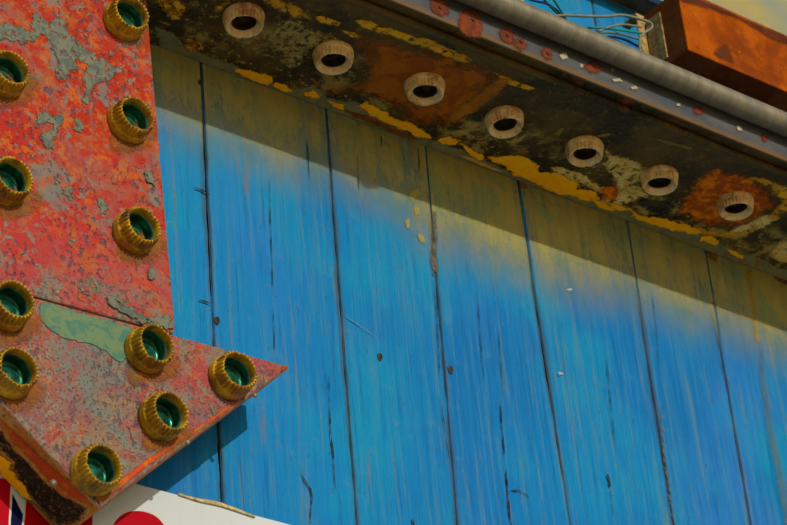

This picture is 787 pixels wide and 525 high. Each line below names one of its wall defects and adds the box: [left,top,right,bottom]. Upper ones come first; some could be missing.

peeling [263,0,471,63]
corrosion [458,9,483,37]
corrosion [499,27,528,52]
corrosion [715,45,732,61]
corrosion [681,0,787,43]
peeling [234,68,293,92]
corrosion [355,37,510,124]
peeling [496,73,535,90]
peeling [358,101,787,259]
corrosion [679,170,777,226]
peeling [418,212,438,275]